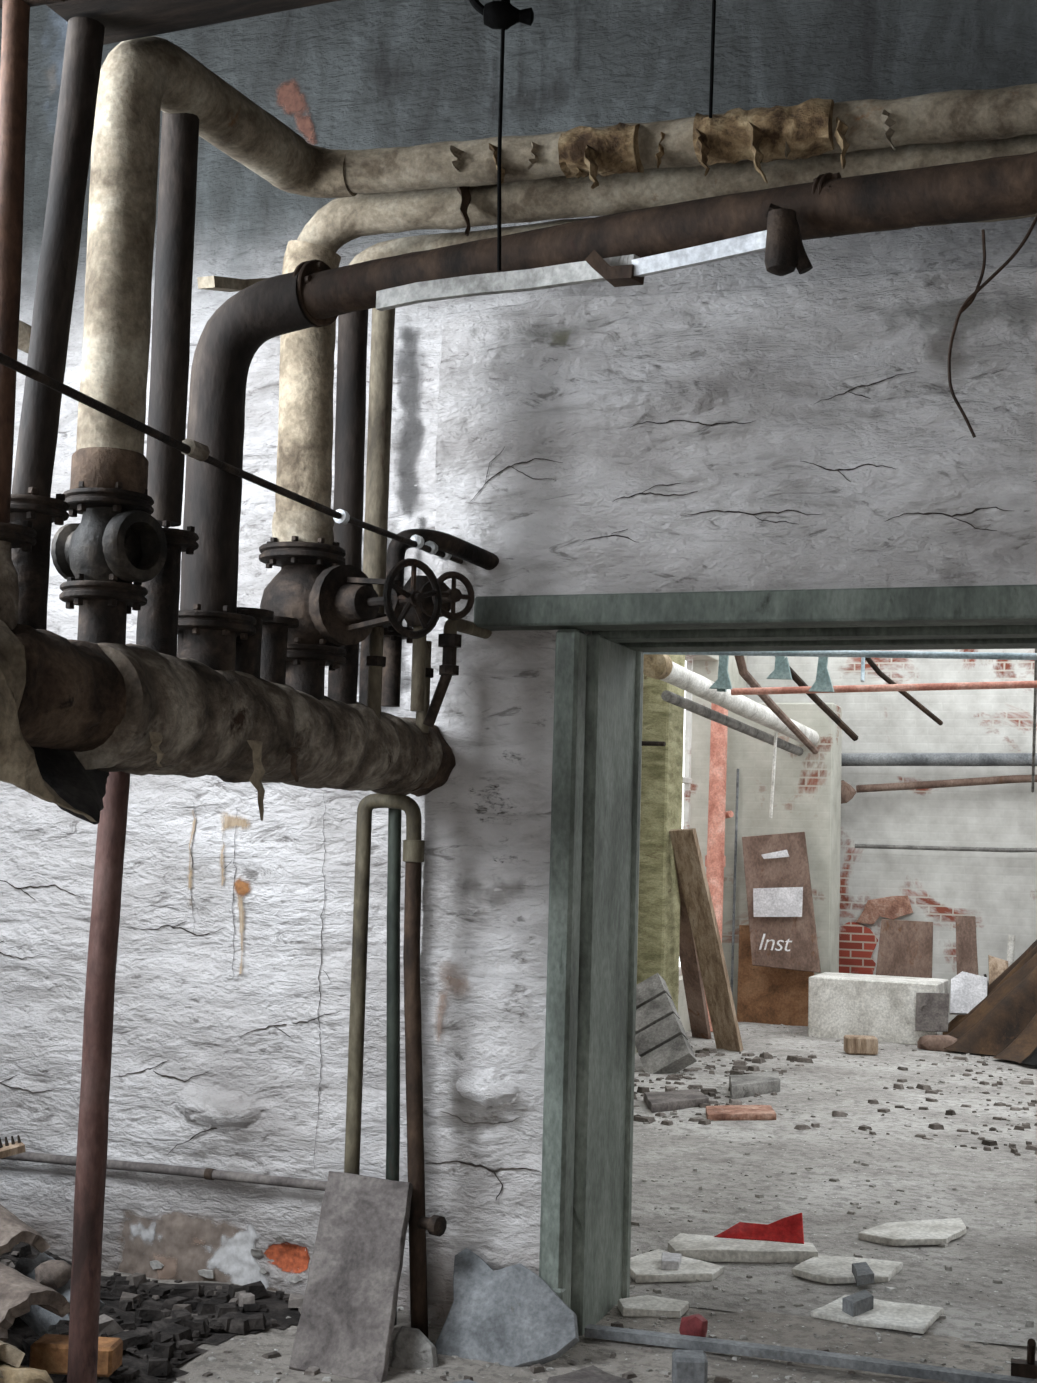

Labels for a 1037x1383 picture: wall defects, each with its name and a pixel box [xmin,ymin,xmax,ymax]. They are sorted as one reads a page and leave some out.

water stain [397,329,424,529]
crack [470,447,563,502]
crack [800,461,895,482]
crack [886,507,1009,531]
crack [0,880,82,900]
crack [134,802,237,977]
rust [220,816,250,974]
crack [242,795,338,1168]
crack [0,1075,63,1093]
crack [112,1061,209,1082]
crack [425,1160,542,1200]
peeling [119,1210,310,1293]